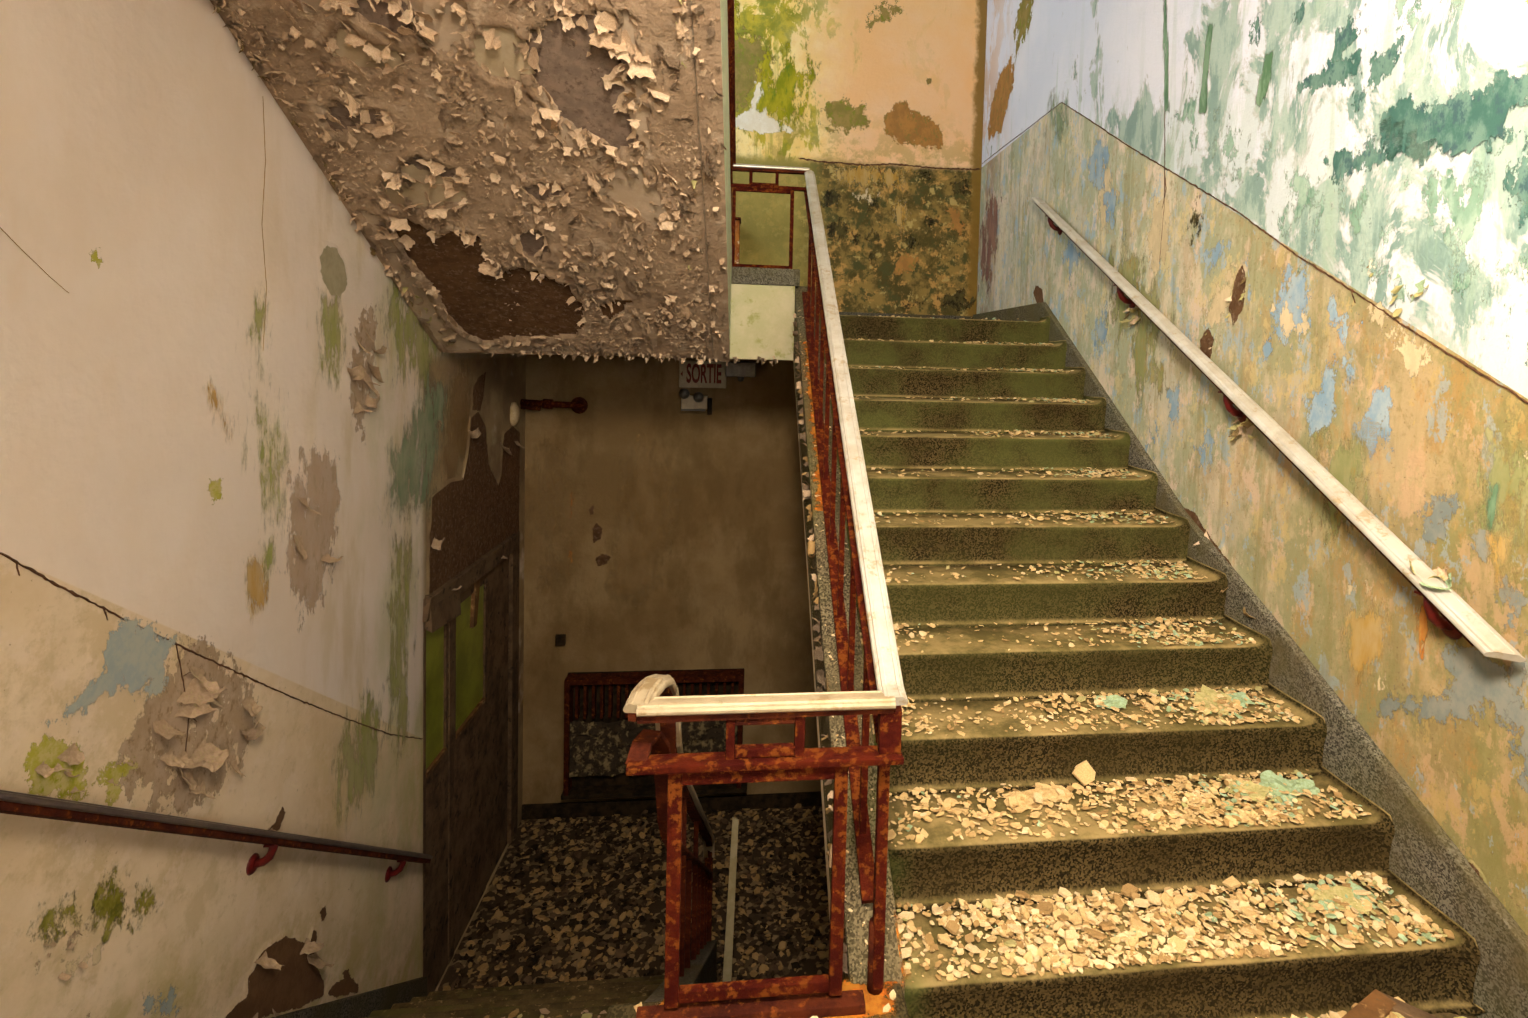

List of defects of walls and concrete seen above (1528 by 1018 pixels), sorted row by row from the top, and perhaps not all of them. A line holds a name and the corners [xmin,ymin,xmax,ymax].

flaking render [818,97,943,150]
flaking render [211,0,826,692]
corrosion [803,341,831,511]
peeling [1189,418,1257,472]
peeling [1351,386,1394,460]
flaking render [1183,503,1297,644]
peeling [1414,491,1460,544]
peeling [22,617,266,815]
peeling [1365,574,1528,793]
peeling [824,779,833,868]
flaking render [220,905,360,1018]
corrosion [822,913,906,1018]